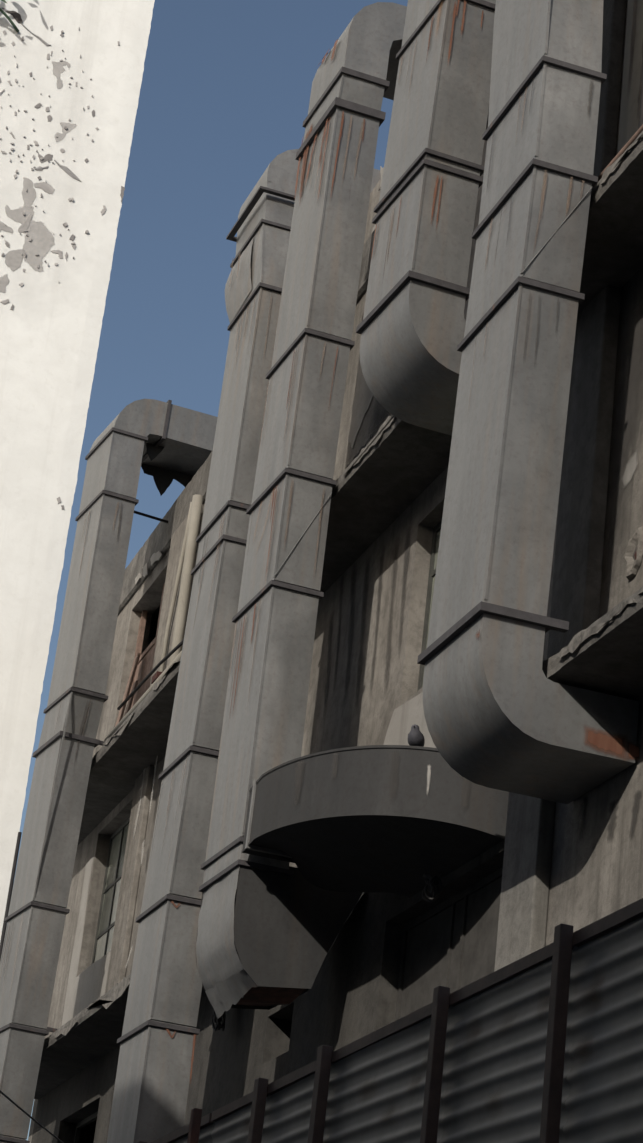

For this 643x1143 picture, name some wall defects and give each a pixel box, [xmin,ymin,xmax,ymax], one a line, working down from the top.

peeling [0,26,99,310]
corrosion [295,112,365,199]
peeling [622,451,638,487]
flaking render [623,526,643,580]
spalling [557,589,643,658]
corrosion [585,729,640,758]
damp [631,792,640,834]